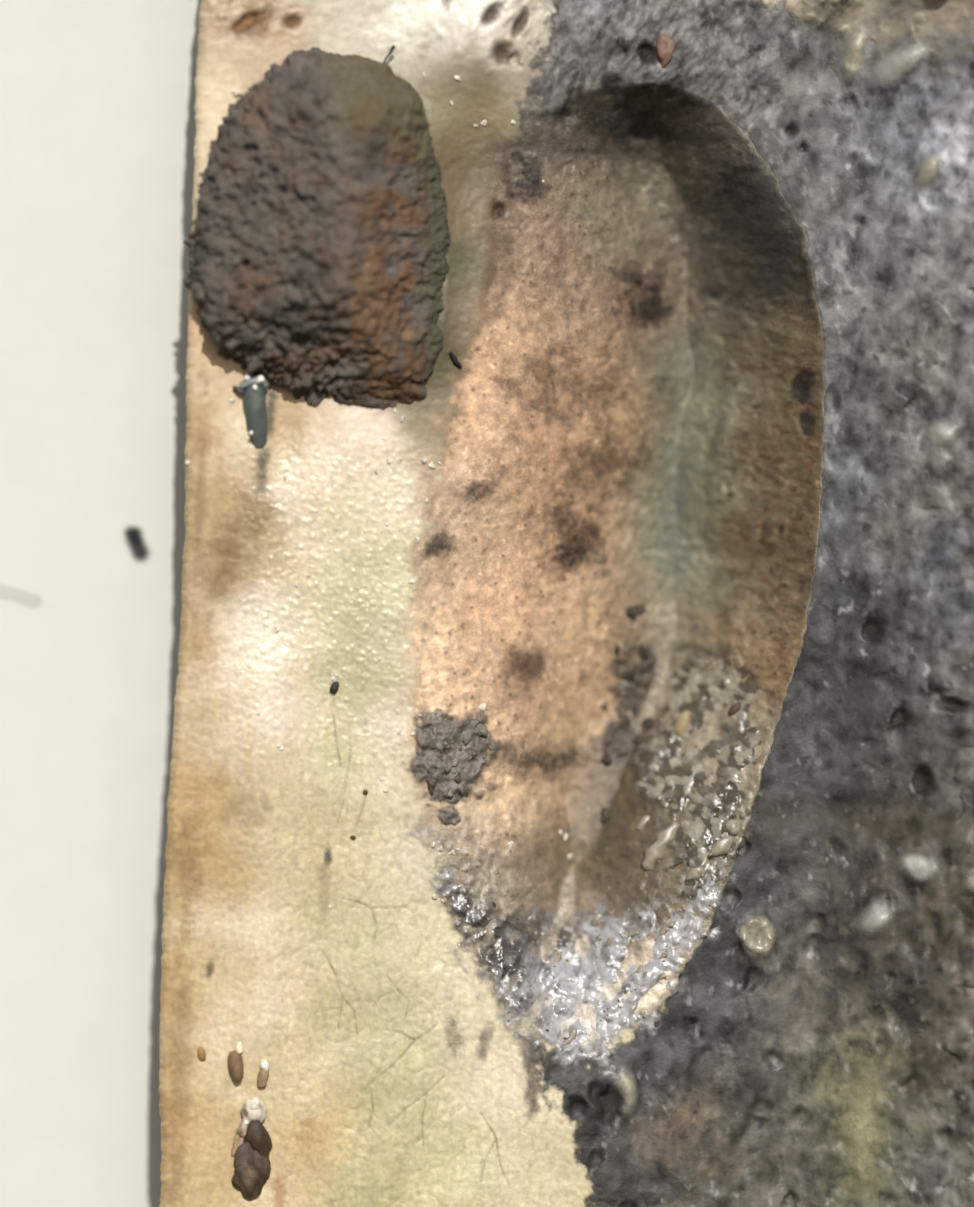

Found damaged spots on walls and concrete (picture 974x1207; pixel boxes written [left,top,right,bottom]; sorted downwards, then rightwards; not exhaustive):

water stain [497,157,544,216]
water stain [624,274,671,325]
water stain [792,371,815,435]
water stain [554,510,599,567]
spalling [410,0,974,1207]
water stain [436,646,764,1112]
water stain [842,1084,877,1187]